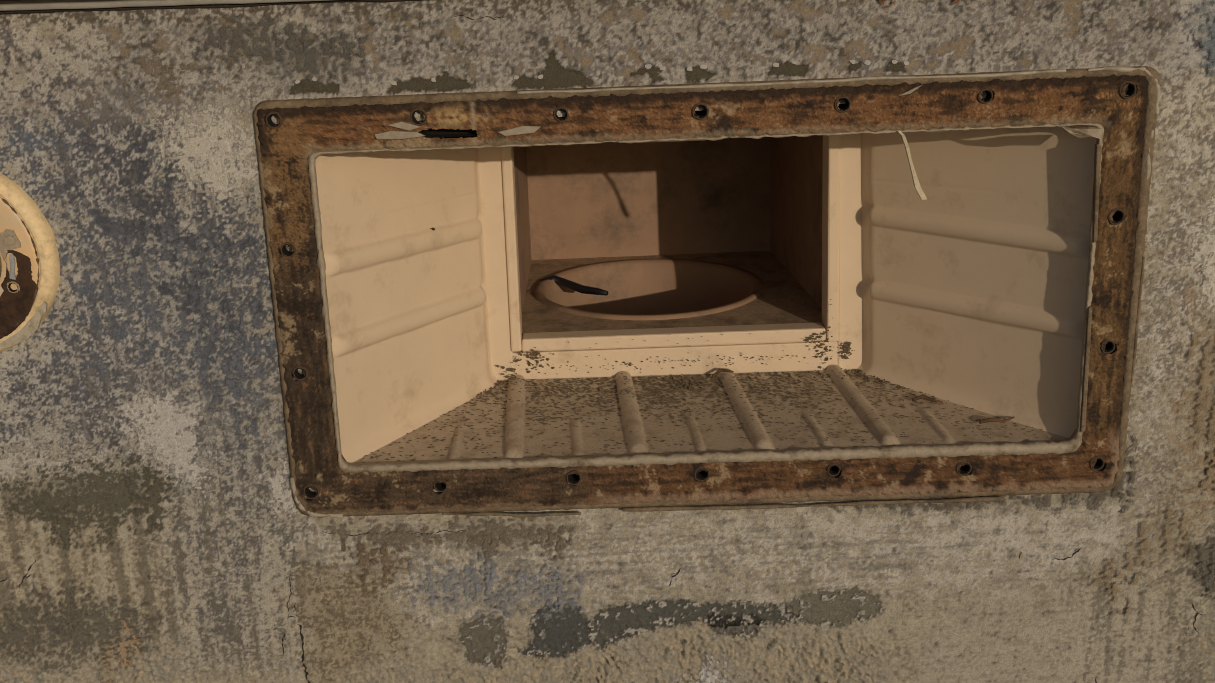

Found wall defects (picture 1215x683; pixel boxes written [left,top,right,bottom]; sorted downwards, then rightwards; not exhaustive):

peeling [289,77,339,95]
peeling [387,71,473,95]
peeling [512,50,594,89]
peeling [630,64,666,83]
peeling [685,64,715,83]
peeling [768,60,809,76]
peeling [848,60,871,73]
peeling [886,60,909,73]
water stain [1180,195,1215,496]
water stain [799,437,1215,622]
water stain [0,583,161,673]
crack [282,578,310,683]